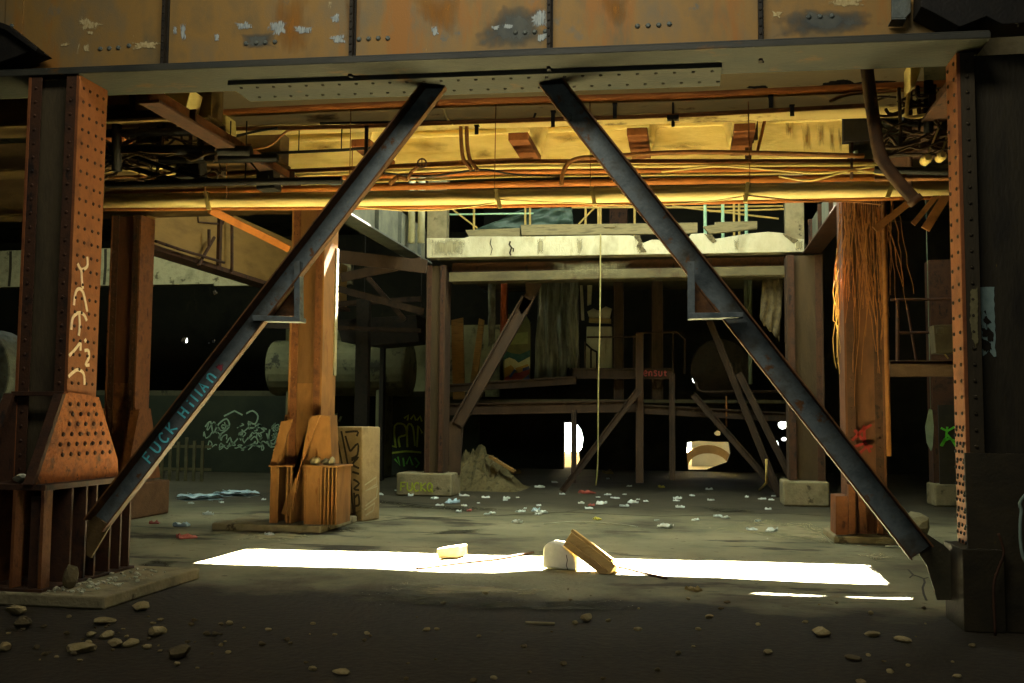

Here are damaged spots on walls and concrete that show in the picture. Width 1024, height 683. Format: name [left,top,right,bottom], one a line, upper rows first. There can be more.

peeling [79,18,100,51]
peeling [134,41,161,49]
peeling [270,21,311,35]
leakage [481,11,536,44]
leakage [789,11,863,32]